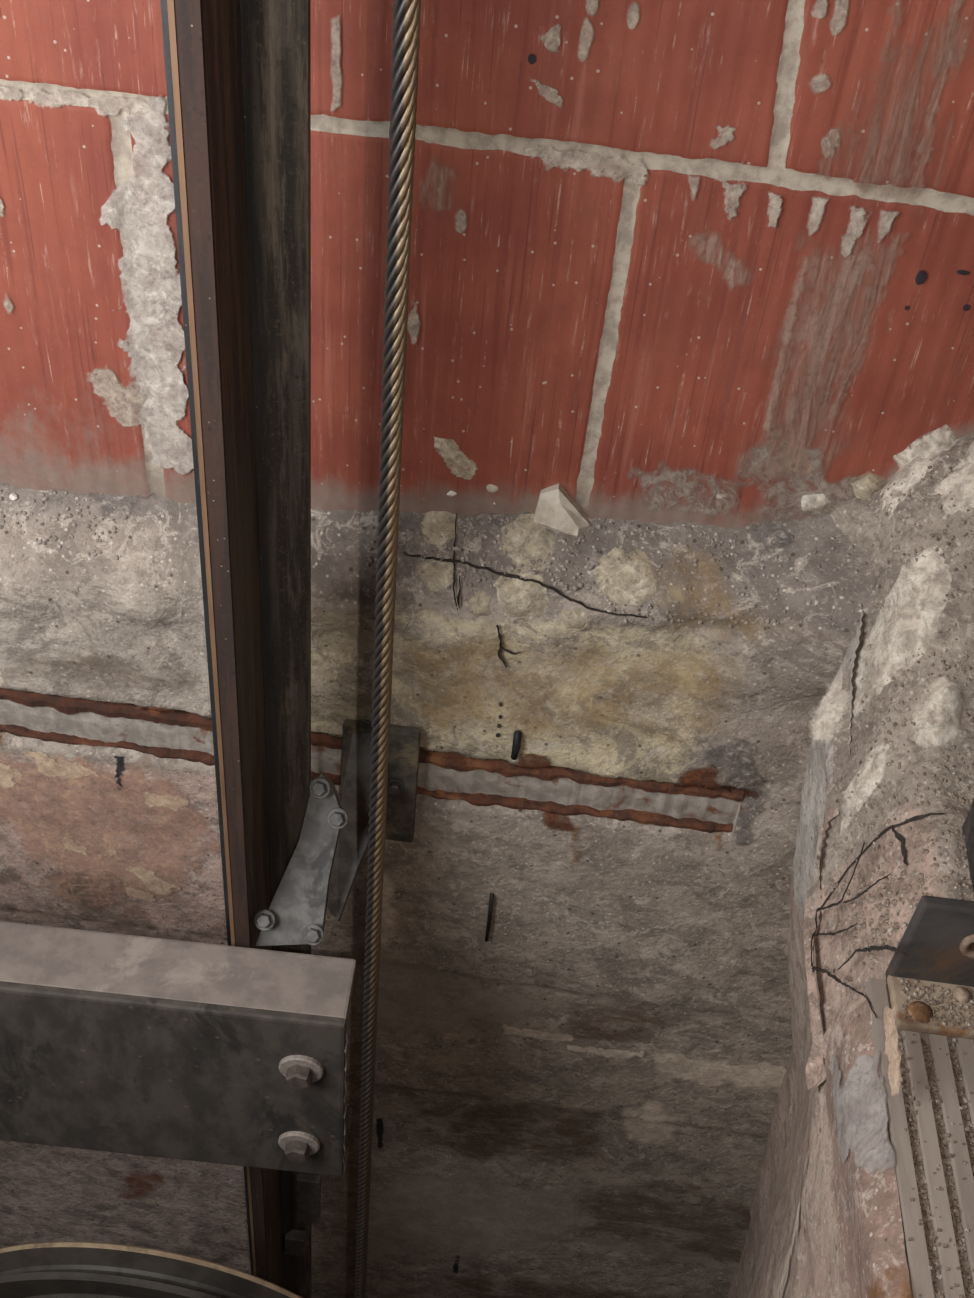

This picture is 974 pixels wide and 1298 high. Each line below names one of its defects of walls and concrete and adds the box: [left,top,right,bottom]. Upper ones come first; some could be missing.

peeling [89,98,194,474]
water stain [767,193,782,227]
water stain [808,197,828,235]
water stain [739,206,899,480]
spalling [0,484,211,718]
crack [403,513,647,618]
spalling [0,732,228,946]
rust [517,754,550,769]
rust [543,812,581,862]
spalling [311,509,875,1298]
rust [675,766,758,811]
crack [811,813,944,1018]